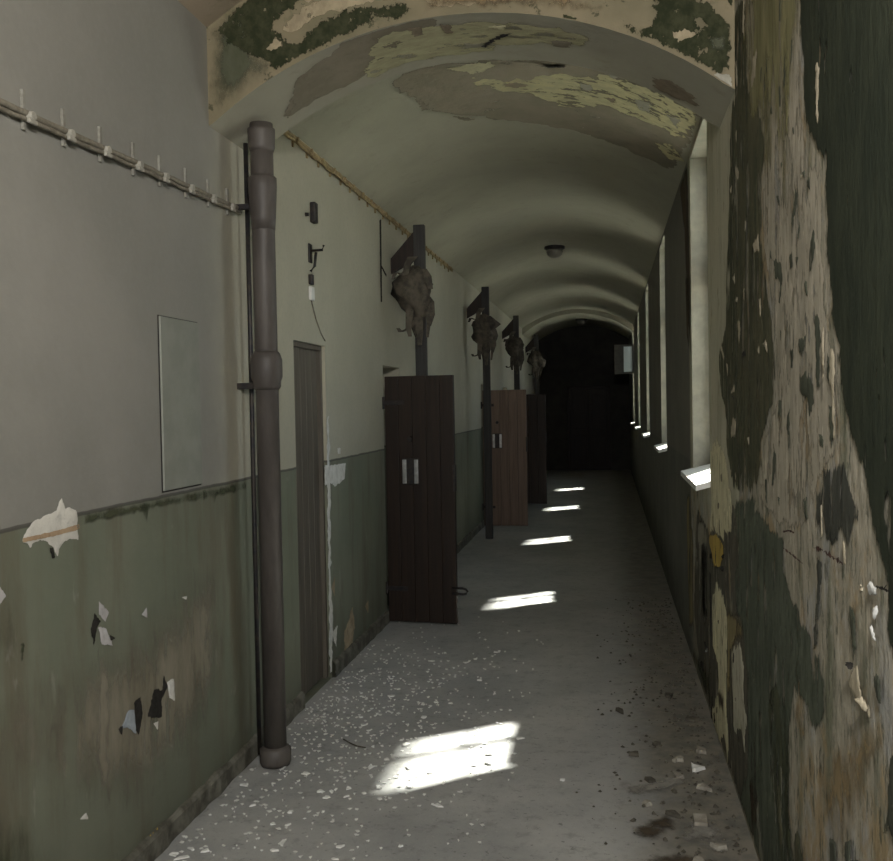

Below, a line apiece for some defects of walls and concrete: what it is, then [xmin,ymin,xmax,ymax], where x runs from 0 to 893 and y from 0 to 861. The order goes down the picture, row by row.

peeling [282,0,375,33]
peeling [364,22,699,162]
peeling [710,0,836,541]
peeling [22,498,79,558]
leakage [86,485,236,522]
peeling [91,602,115,646]
peeling [859,582,878,641]
leakage [77,593,210,784]
flaking render [119,676,175,735]
peeling [700,583,747,763]
peeling [845,662,881,718]
flaking render [883,756,893,837]